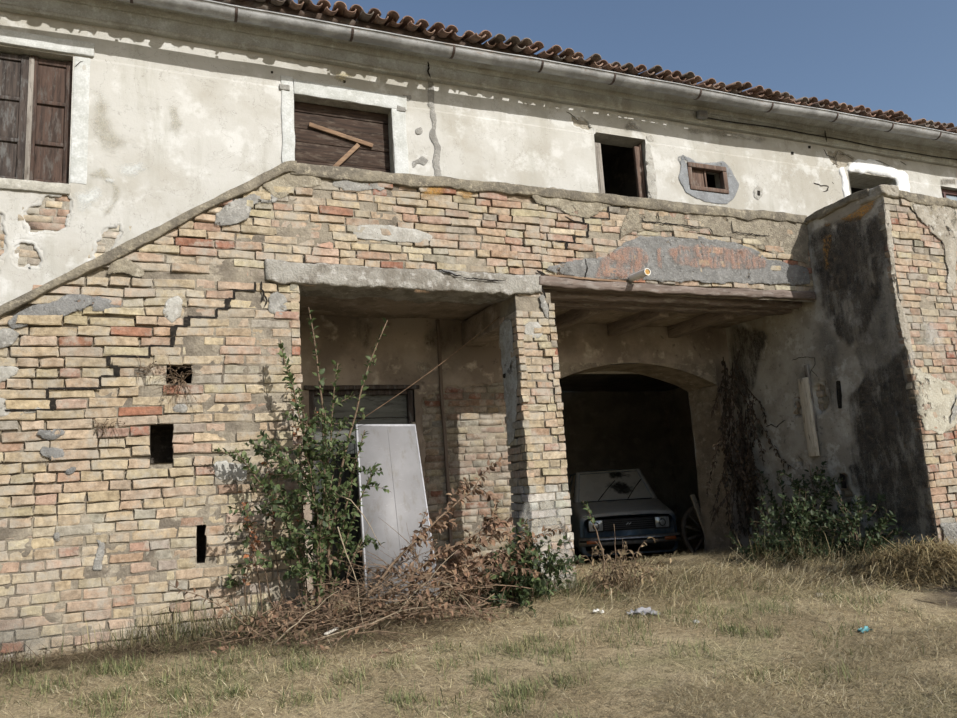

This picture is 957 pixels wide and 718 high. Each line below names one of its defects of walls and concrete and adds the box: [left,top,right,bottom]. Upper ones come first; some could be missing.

flaking render [0,190,98,278]
peeling [78,222,132,260]
water stain [811,216,887,345]
water stain [849,349,937,543]